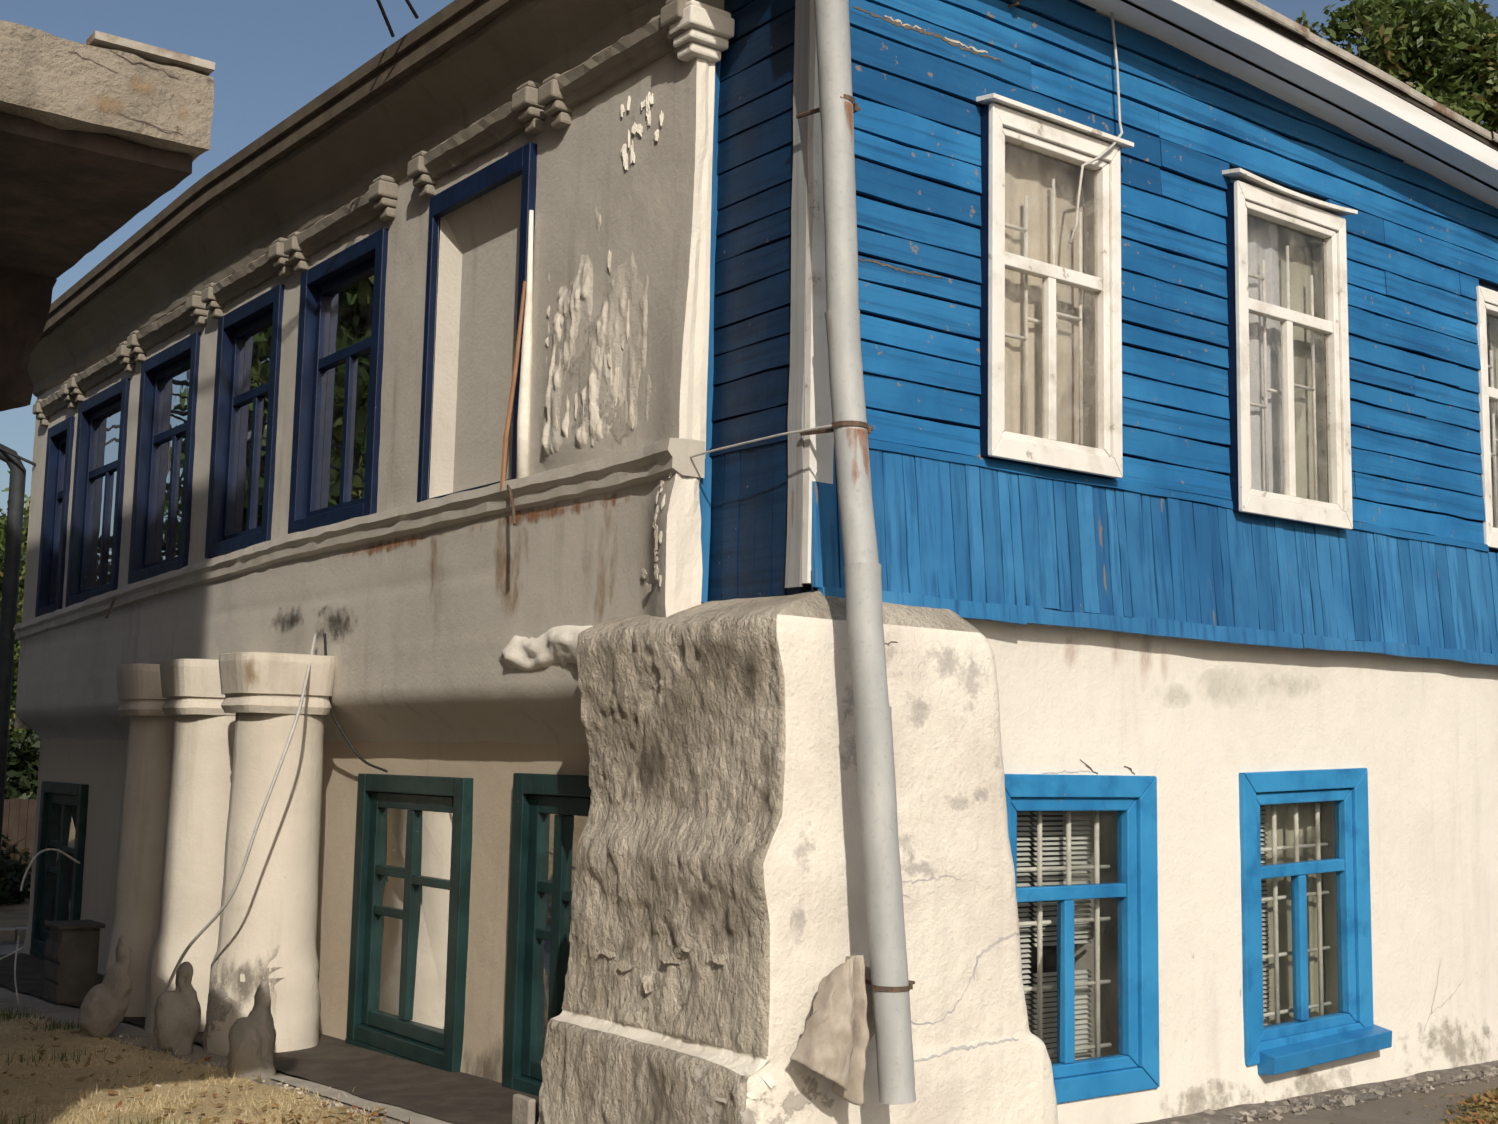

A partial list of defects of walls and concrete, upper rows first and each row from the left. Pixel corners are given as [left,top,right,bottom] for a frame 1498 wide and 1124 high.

peeling [620,92,664,170]
rust [845,101,853,130]
peeling [541,250,652,457]
water stain [497,549,517,603]
water stain [319,614,349,636]
crack [902,875,962,897]
crack [911,932,1020,1062]